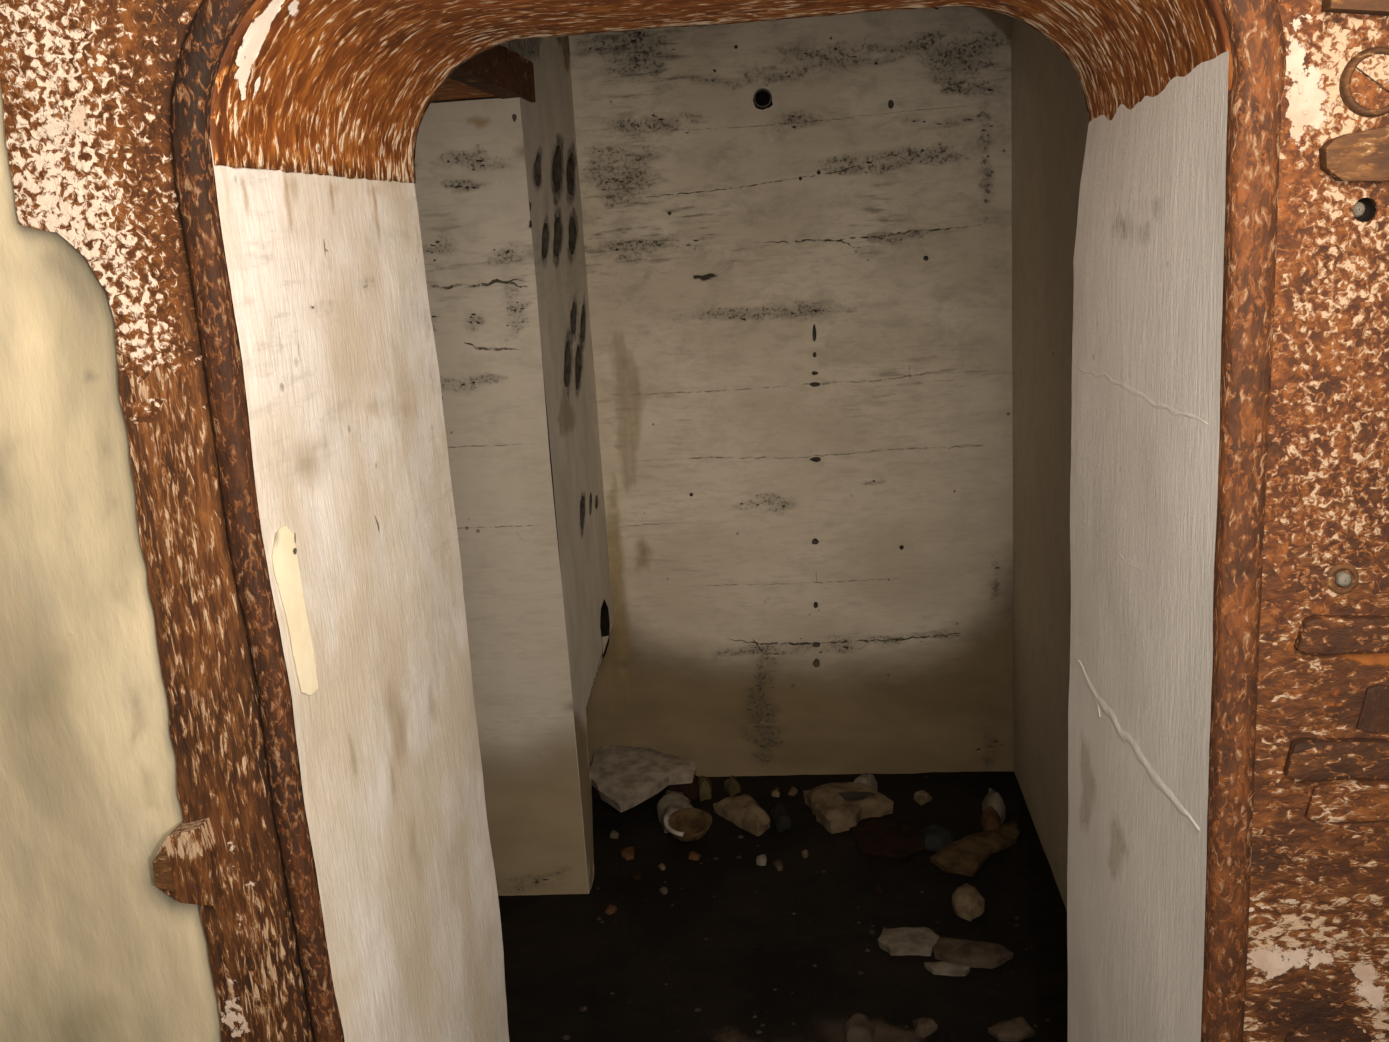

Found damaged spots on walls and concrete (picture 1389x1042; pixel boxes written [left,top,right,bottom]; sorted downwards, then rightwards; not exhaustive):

peeling [234,0,299,100]
water stain [587,30,676,72]
mould [745,32,1008,93]
water stain [444,151,485,190]
water stain [594,148,651,206]
water stain [829,144,952,174]
water stain [707,304,824,321]
peeling [272,525,319,695]
rust [1342,652,1389,666]
water stain [482,531,1014,896]